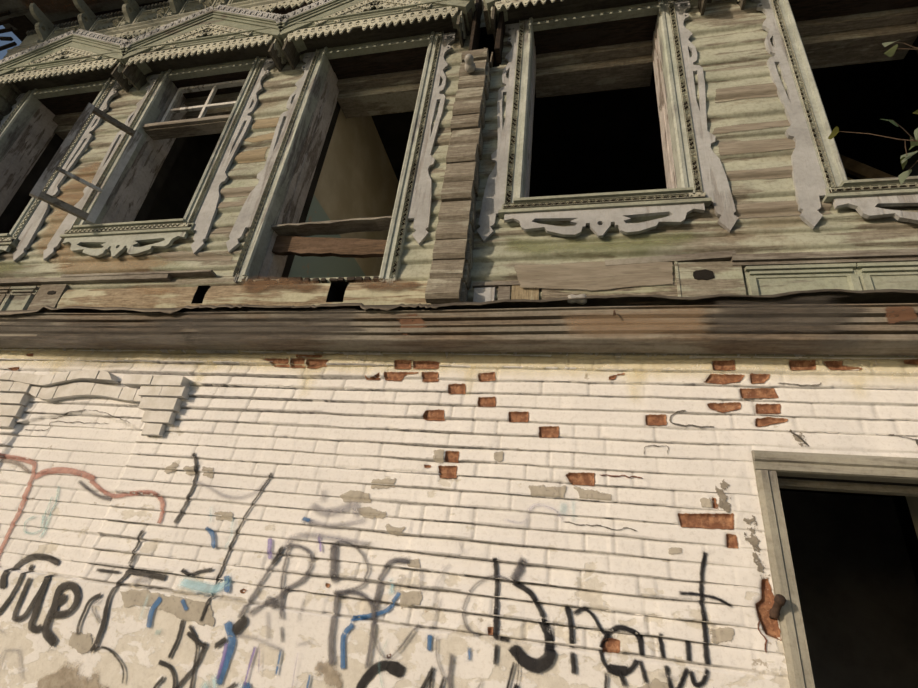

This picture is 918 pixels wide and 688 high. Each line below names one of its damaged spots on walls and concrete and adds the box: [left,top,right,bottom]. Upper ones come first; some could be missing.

spalling [264,354,328,369]
spalling [365,360,466,394]
spalling [477,396,496,407]
spalling [705,360,788,427]
crack [25,409,148,436]
spalling [423,409,445,421]
spalling [508,411,529,422]
spalling [539,426,559,438]
spalling [645,414,667,426]
spalling [424,449,459,479]
spalling [678,479,781,641]
peeling [37,665,108,688]